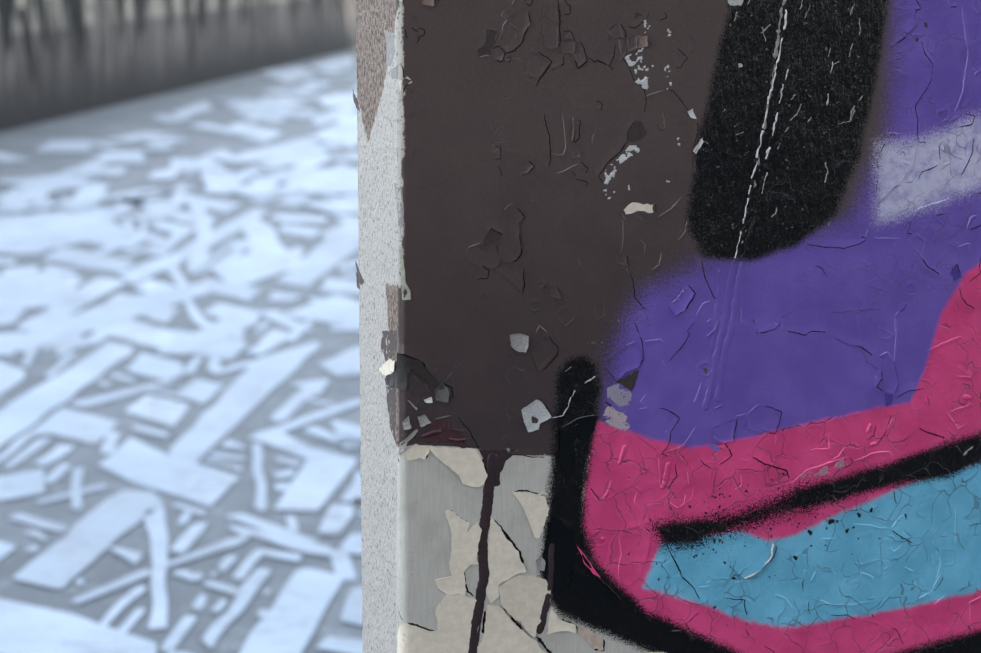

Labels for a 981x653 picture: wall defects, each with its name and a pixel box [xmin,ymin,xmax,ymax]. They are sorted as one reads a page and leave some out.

peeling [537,11,713,199]
peeling [622,191,690,220]
crack [587,260,908,368]
crack [799,221,981,314]
peeling [379,330,487,487]
crack [506,448,549,461]
peeling [521,400,552,432]
peeling [559,332,644,477]
crack [553,367,777,653]
crack [852,489,914,544]
peeling [397,490,655,653]
crack [794,569,905,648]